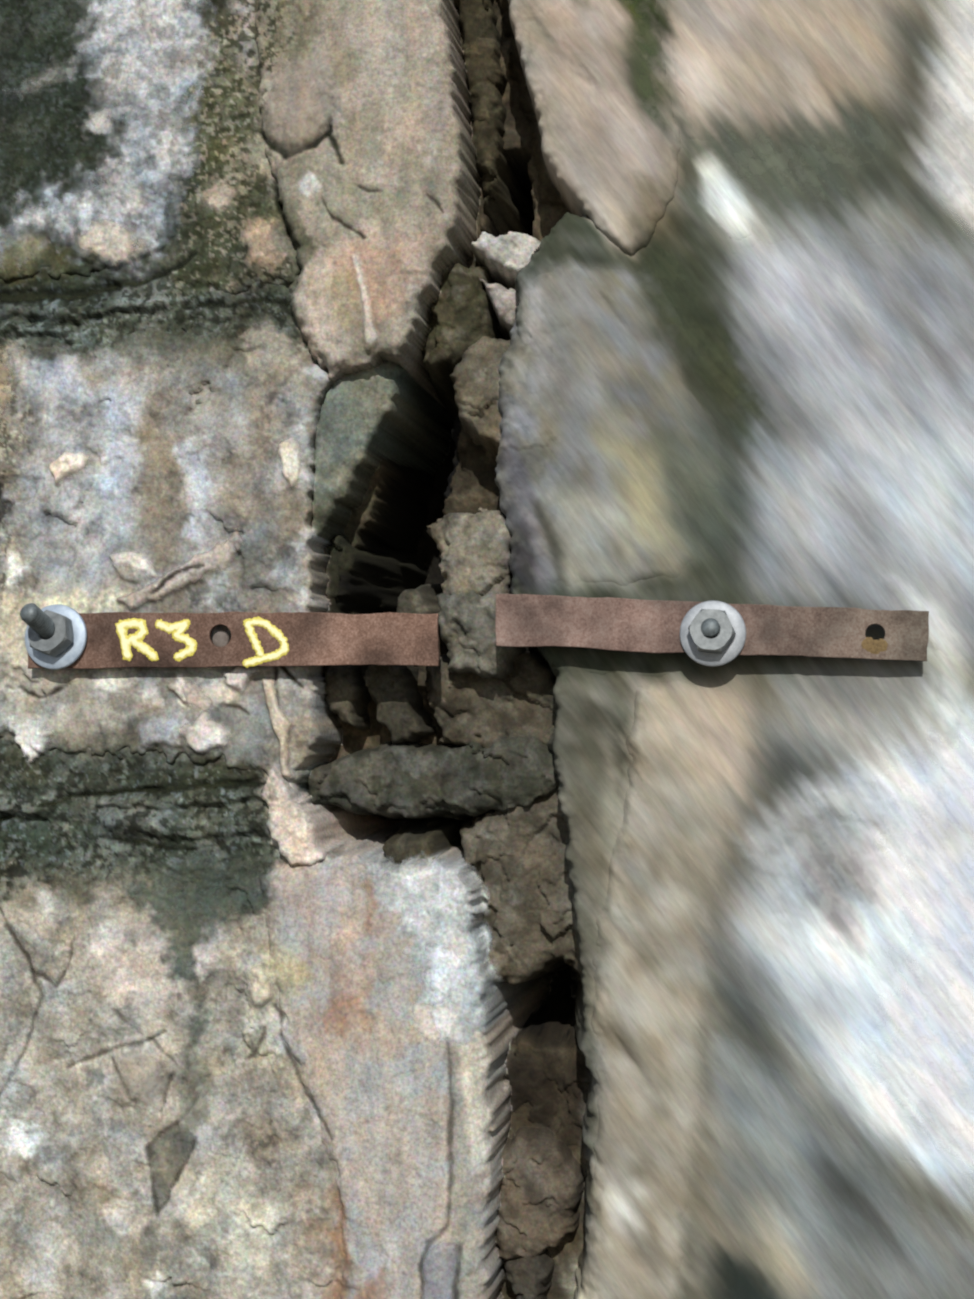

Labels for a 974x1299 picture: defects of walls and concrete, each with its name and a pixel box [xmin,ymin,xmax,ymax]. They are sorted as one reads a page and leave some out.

efflorescence [0,0,210,266]
crack [261,120,379,248]
crack [440,0,573,275]
water stain [8,719,51,759]
crack [21,686,63,698]
crack [275,666,303,702]
crack [323,424,501,762]
crack [500,968,589,1299]